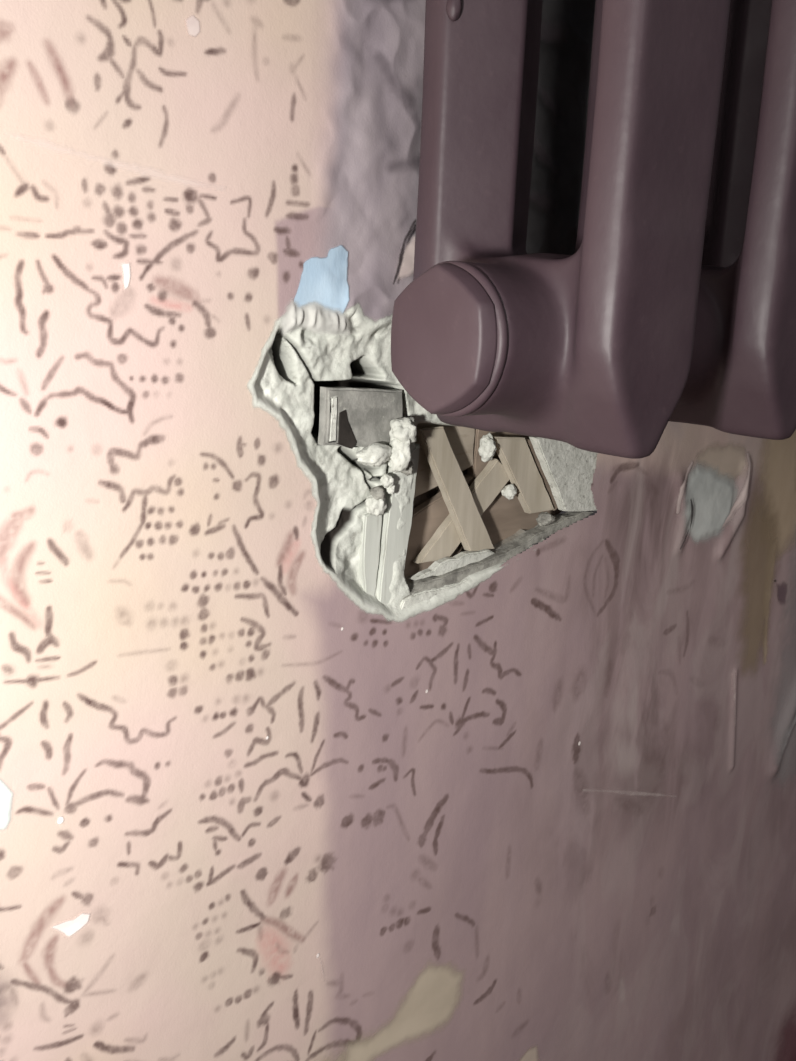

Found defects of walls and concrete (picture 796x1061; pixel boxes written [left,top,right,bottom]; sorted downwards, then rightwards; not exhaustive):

flaking render [247,245,598,622]
flaking render [676,445,751,549]
peeling [0,780,13,829]